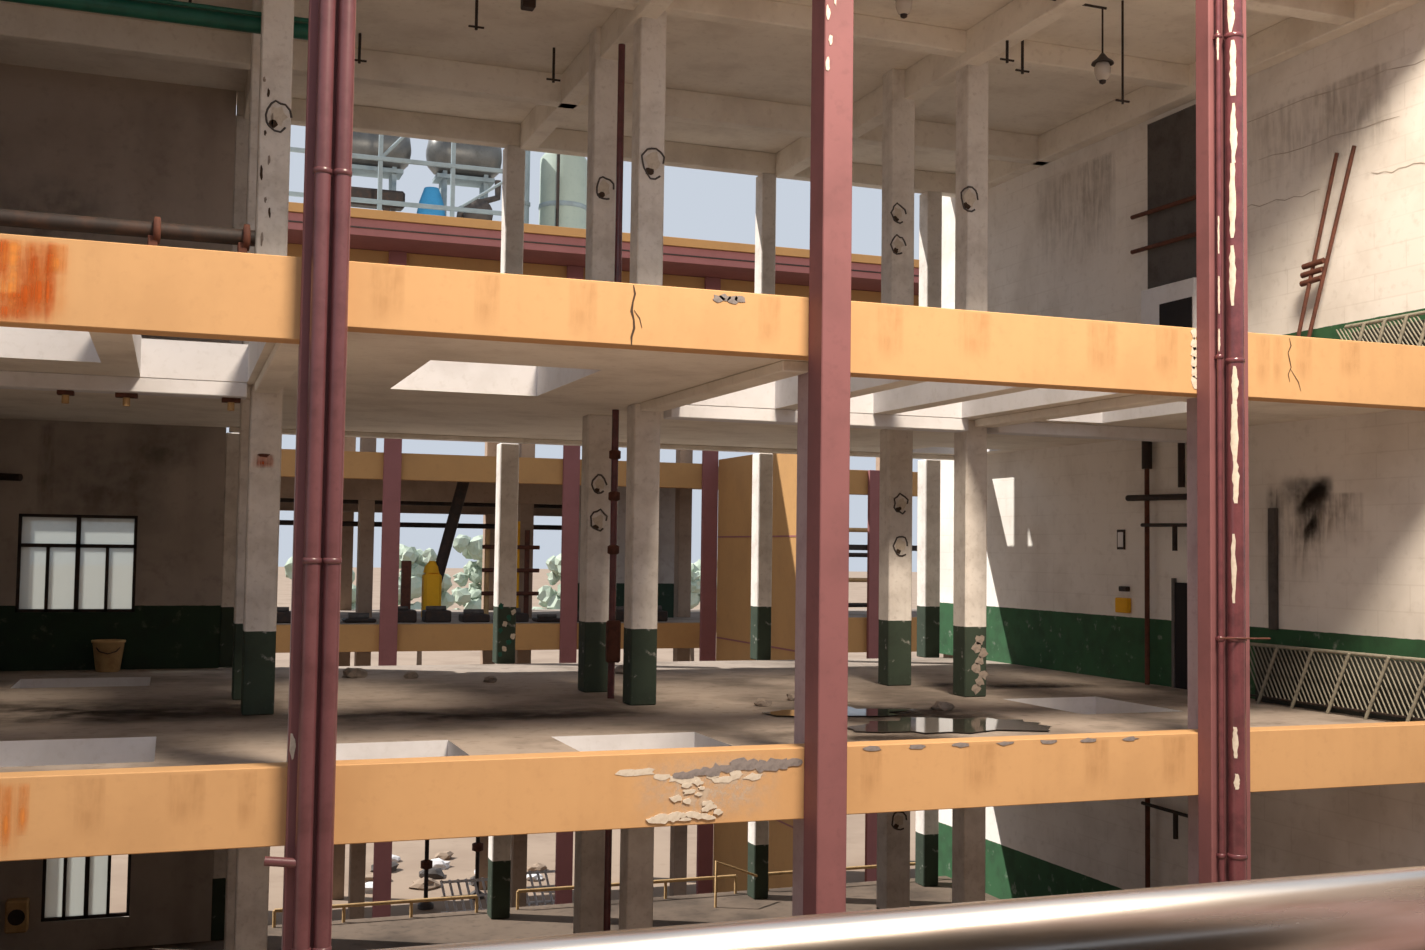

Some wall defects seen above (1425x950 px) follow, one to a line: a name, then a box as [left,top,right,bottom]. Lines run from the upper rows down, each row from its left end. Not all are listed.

peeling [825,0,836,70]
peeling [1217,0,1238,351]
corrosion [0,241,59,316]
crack [630,285,642,345]
peeling [1230,366,1240,503]
peeling [615,757,803,824]
peeling [1232,727,1240,790]